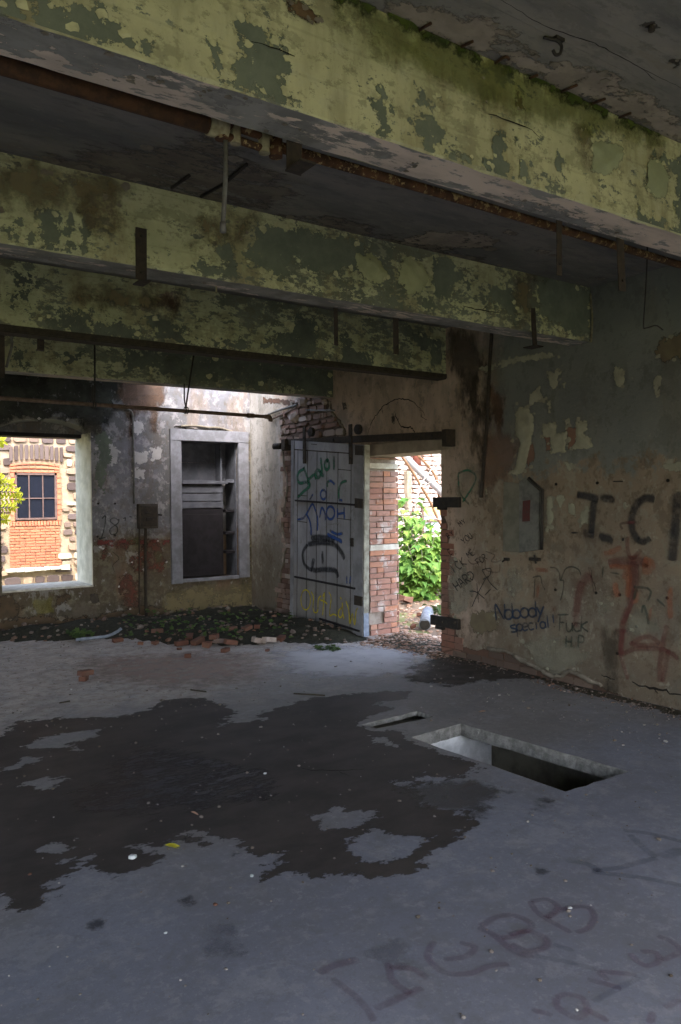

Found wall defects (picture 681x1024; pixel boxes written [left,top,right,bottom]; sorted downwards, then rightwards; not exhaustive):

peeling [0,0,178,85]
peeling [193,12,297,111]
spalling [286,0,324,25]
spalling [382,0,681,142]
peeling [370,75,534,184]
peeling [5,205,97,256]
spalling [32,135,502,315]
peeling [634,148,681,234]
peeling [0,270,191,345]
leakage [448,328,487,462]
peeling [479,352,593,476]
leakage [0,691,504,913]